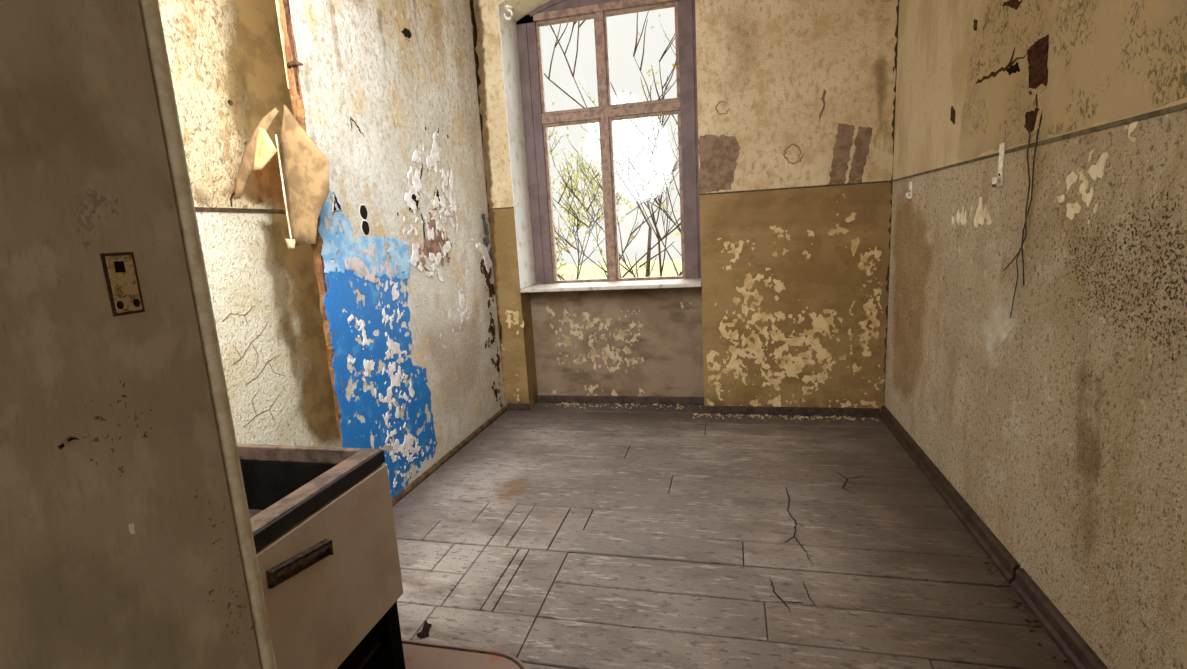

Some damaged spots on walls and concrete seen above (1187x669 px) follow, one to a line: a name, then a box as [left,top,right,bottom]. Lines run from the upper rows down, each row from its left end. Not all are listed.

flaking render [697,135,741,194]
peeling [1056,149,1109,224]
peeling [1128,121,1139,143]
peeling [706,123,884,408]
crack [222,308,285,428]
peeling [311,132,471,499]
peeling [546,306,644,373]
peeling [584,384,645,396]